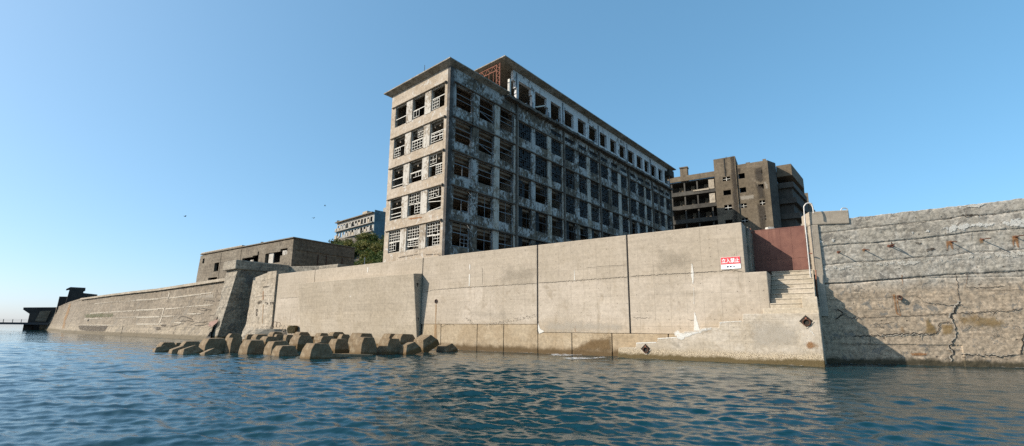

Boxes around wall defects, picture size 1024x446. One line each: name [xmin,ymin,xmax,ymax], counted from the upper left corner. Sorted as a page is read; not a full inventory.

leakage [578,339,611,350]
crack [819,210,1024,362]